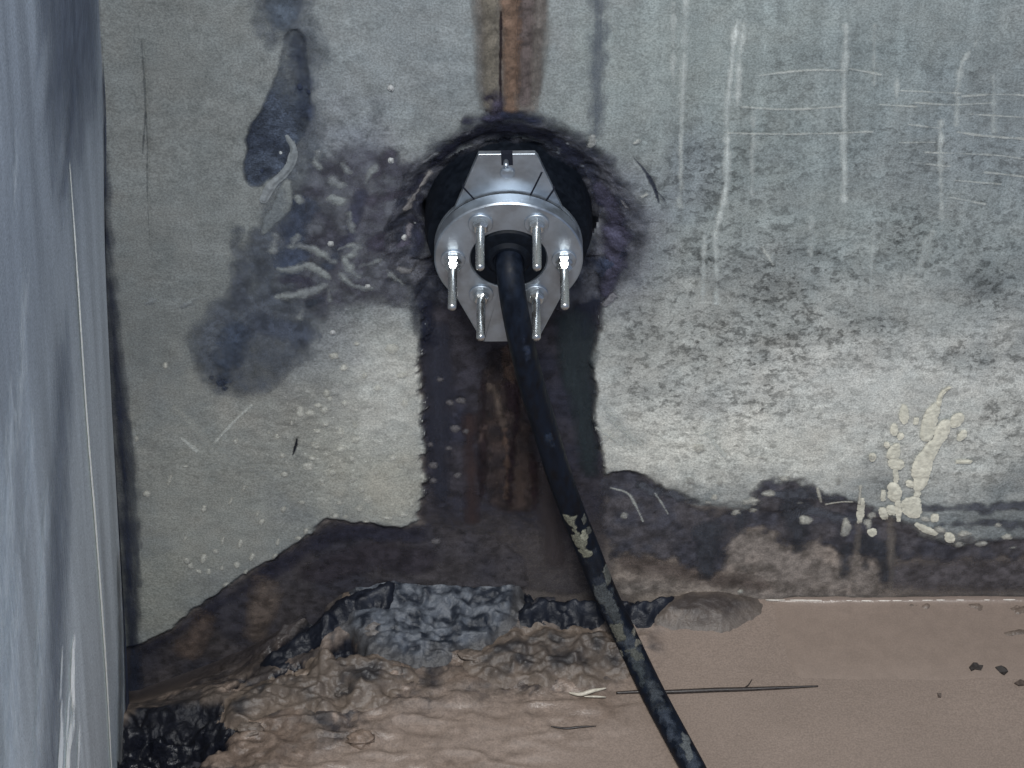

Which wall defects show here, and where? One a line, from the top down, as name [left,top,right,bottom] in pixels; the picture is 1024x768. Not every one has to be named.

corrosion [475,0,546,114]
leakage [701,23,745,304]
leakage [841,24,849,203]
leakage [44,0,568,765]
leakage [535,277,1024,603]